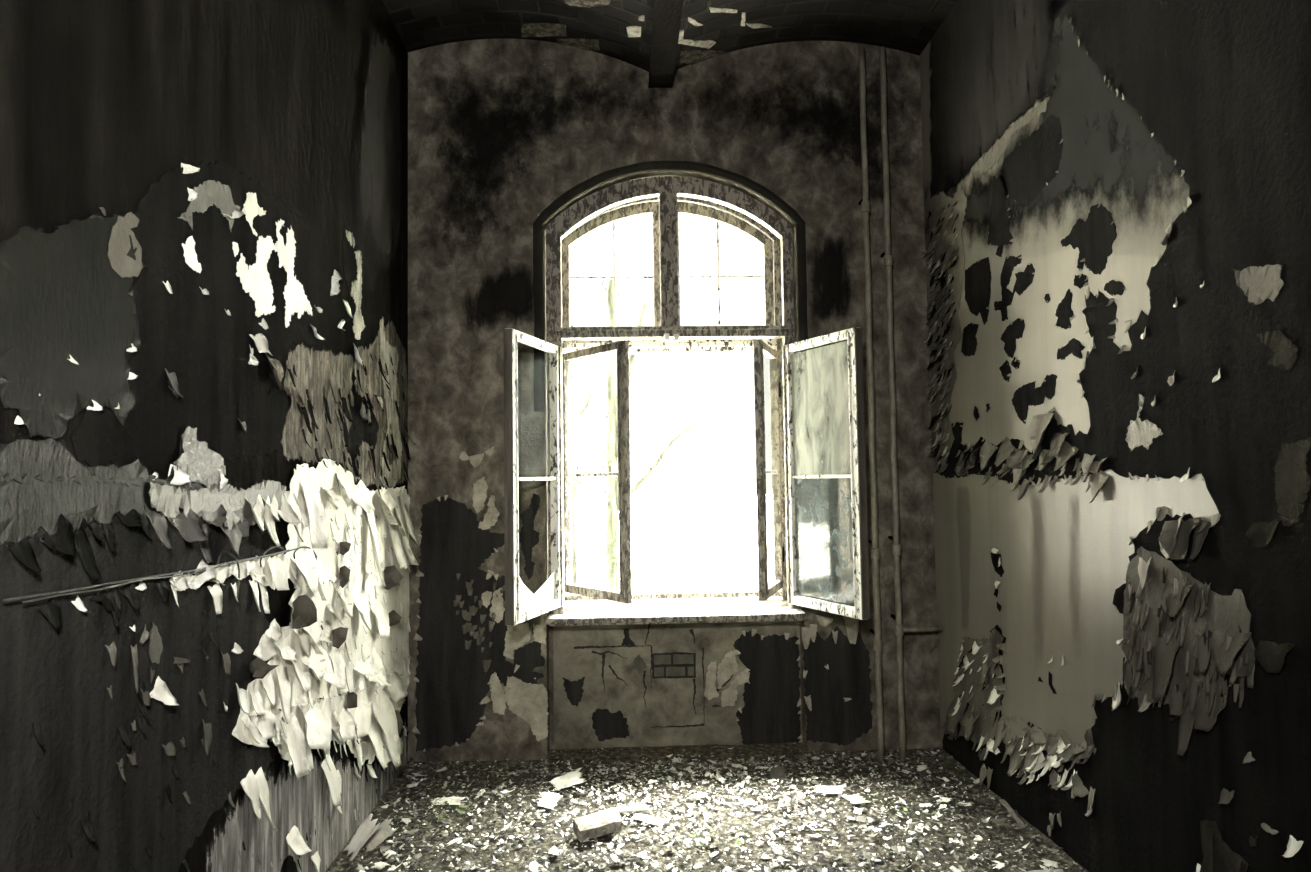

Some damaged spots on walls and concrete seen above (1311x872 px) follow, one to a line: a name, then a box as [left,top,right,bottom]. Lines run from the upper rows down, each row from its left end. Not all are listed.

spalling [564,0,611,8]
spalling [521,23,600,51]
peeling [626,15,645,37]
peeling [678,7,772,64]
flaking render [921,0,1311,872]
flaking render [563,677,585,707]
flaking render [621,615,873,746]
flaking render [592,709,629,741]
peeling [537,768,587,810]
peeling [769,766,788,780]